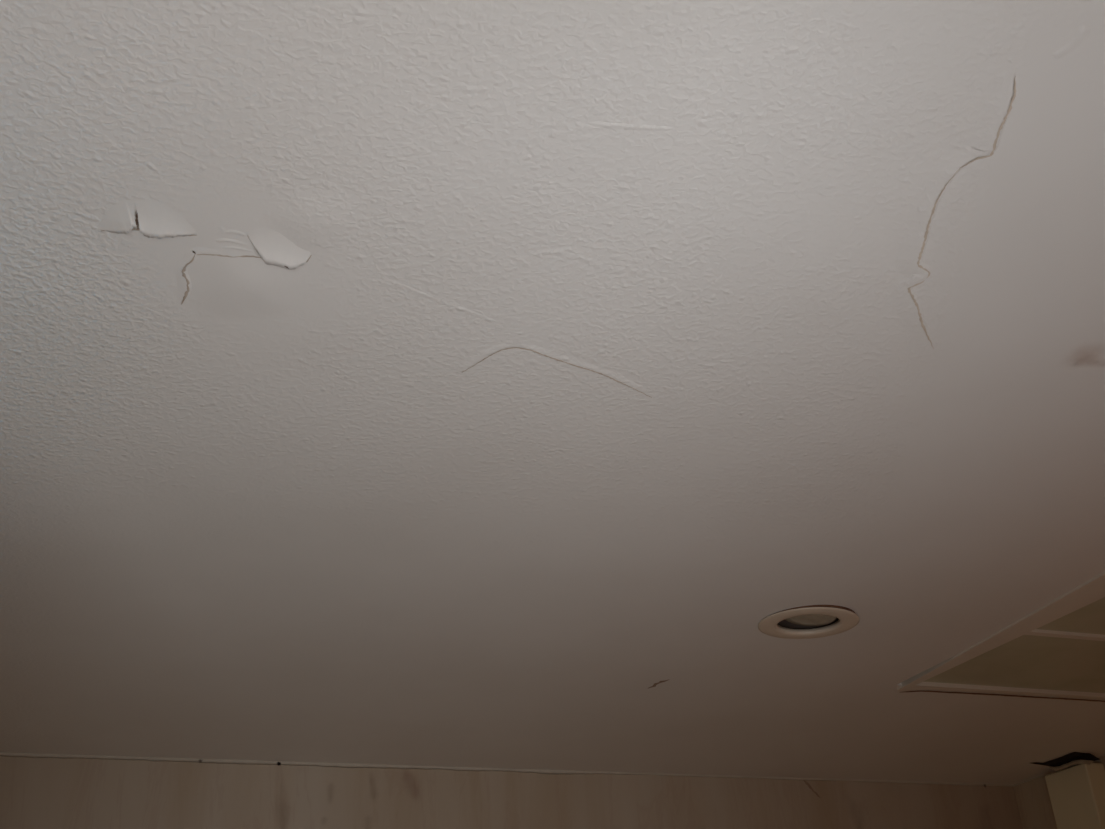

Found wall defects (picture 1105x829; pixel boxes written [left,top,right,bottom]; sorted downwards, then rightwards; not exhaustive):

peeling [98,199,197,239]
peeling [247,227,311,270]
crack [174,247,261,305]